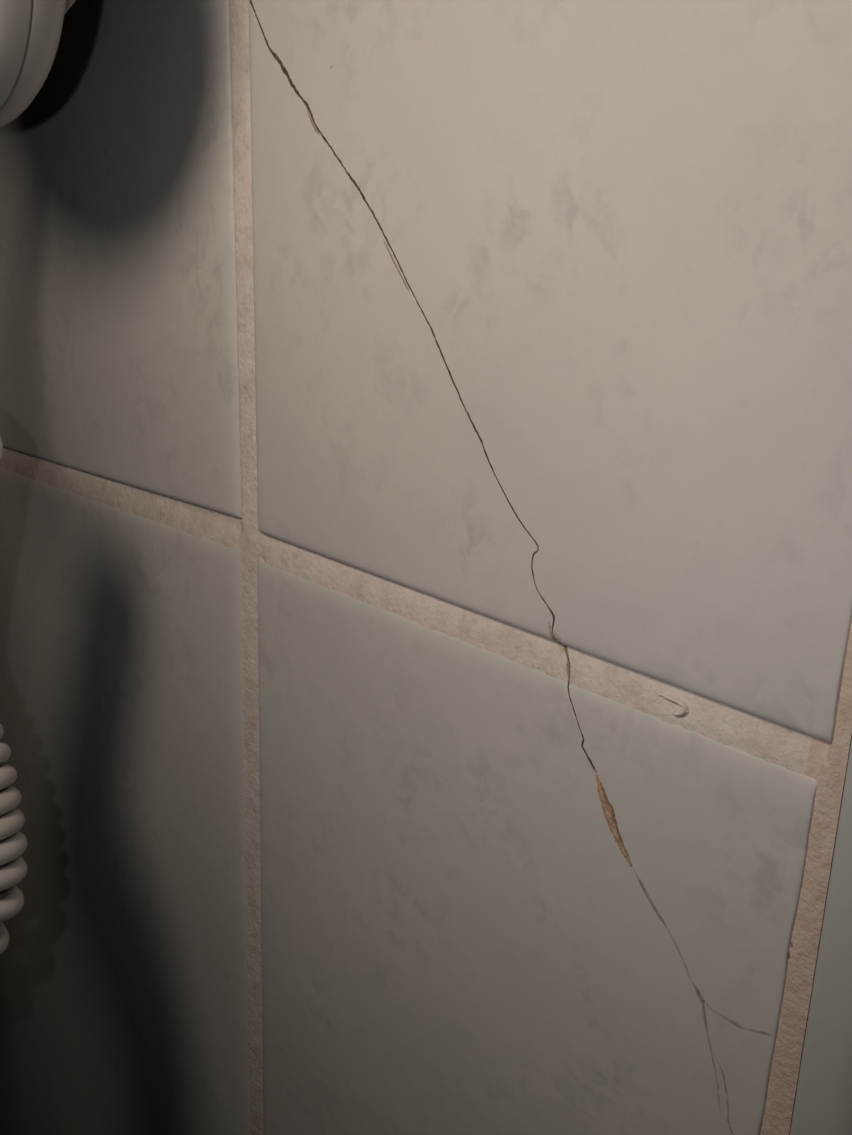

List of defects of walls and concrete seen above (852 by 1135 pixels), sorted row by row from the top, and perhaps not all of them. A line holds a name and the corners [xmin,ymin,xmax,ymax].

crack [249,0,595,770]